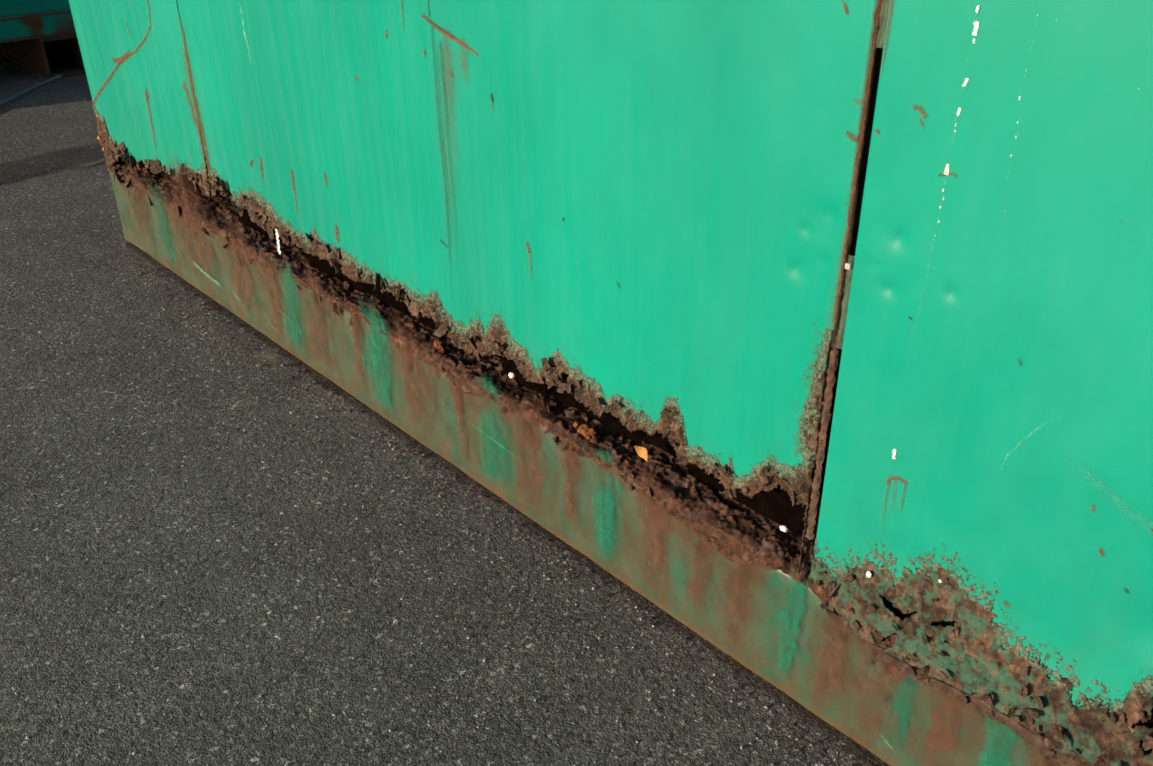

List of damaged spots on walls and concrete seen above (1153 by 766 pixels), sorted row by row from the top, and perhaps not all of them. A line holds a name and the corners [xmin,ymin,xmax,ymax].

corrosion [93,0,890,575]
spalling [483,355,824,544]
corrosion [216,221,1153,766]
crack [1132,697,1153,755]